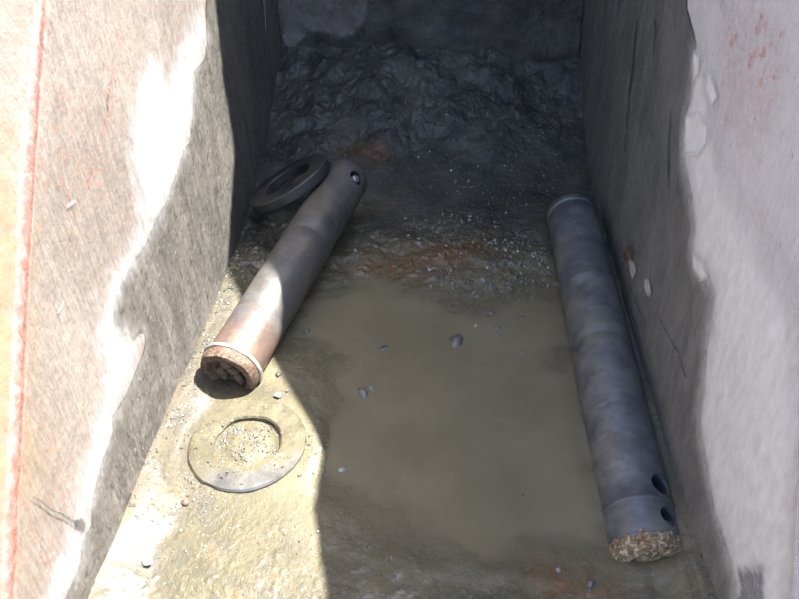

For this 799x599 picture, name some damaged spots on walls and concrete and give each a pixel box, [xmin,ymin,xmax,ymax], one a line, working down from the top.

corrosion [2,0,50,599]
crack [37,498,86,530]
water stain [580,0,799,599]